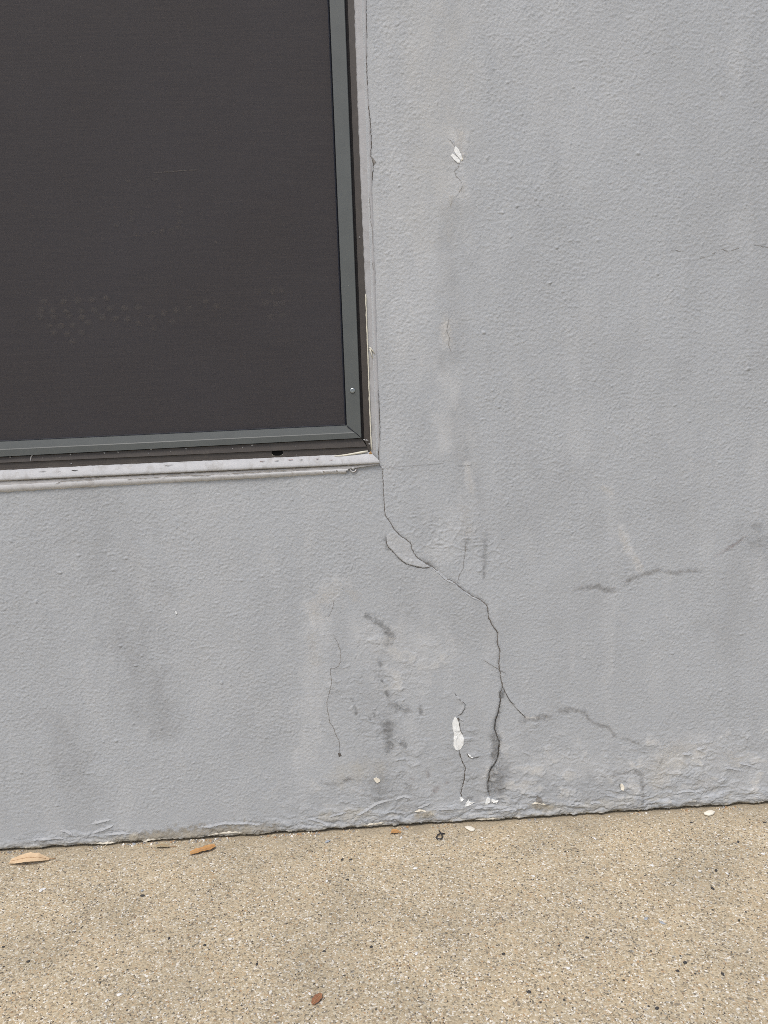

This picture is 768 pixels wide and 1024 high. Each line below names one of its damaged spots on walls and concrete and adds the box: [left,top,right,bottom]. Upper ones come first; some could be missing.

peeling [449,131,465,163]
crack [378,390,527,797]
crack [326,638,342,757]
peeling [452,717,464,751]